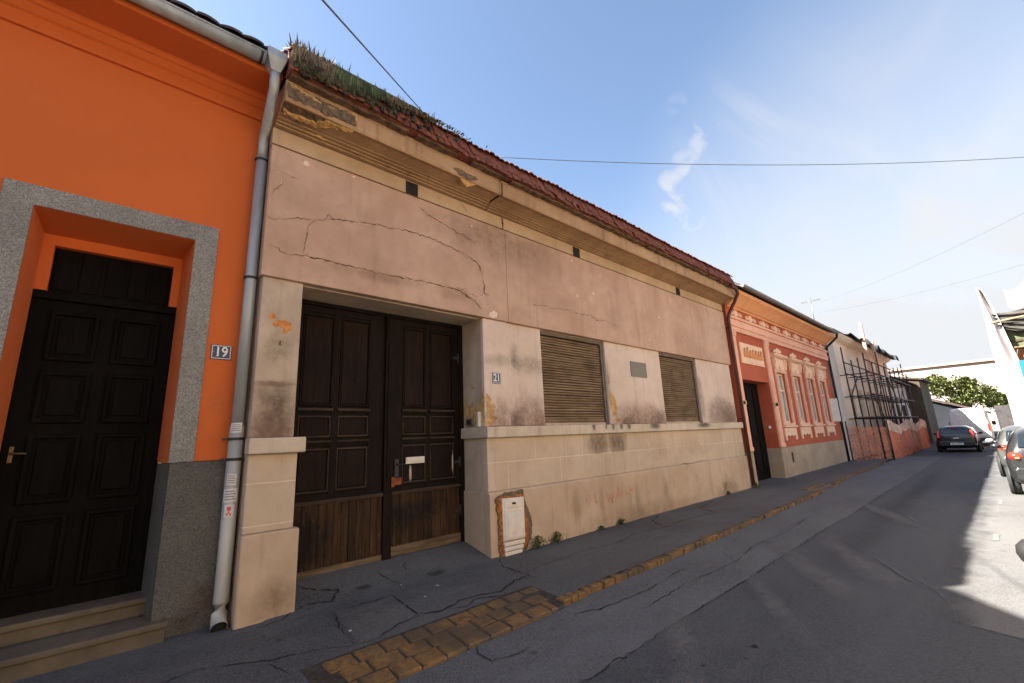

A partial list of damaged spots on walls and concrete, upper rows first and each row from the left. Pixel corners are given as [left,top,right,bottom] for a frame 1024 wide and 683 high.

peeling [283,81,358,141]
crack [266,171,490,308]
peeling [269,312,292,346]
peeling [464,385,498,426]
flaking render [494,489,532,557]